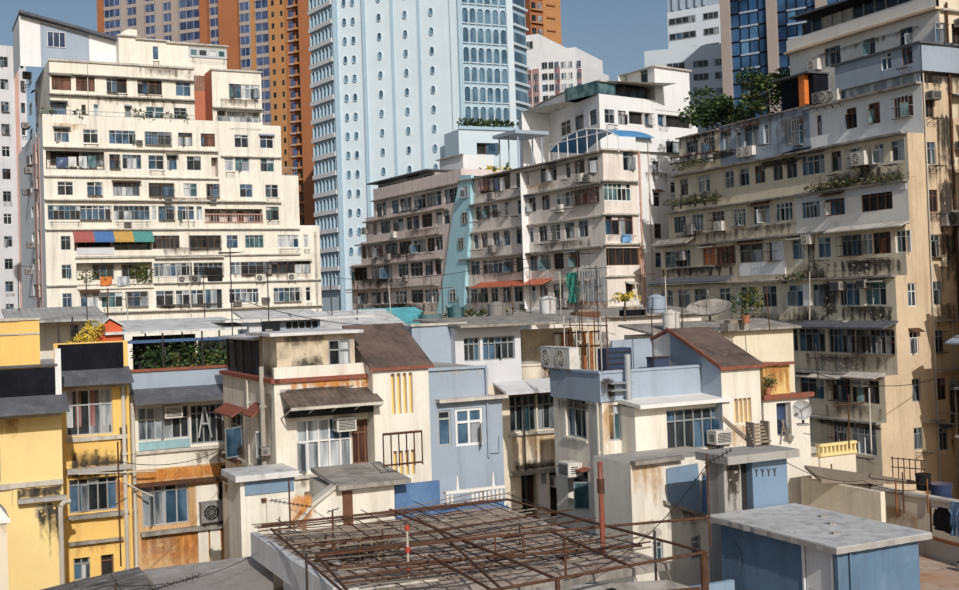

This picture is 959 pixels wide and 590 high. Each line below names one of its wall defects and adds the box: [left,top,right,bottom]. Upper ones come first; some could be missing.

leakage [926,72,959,89]
leakage [937,115,954,211]
leakage [940,226,957,281]
leakage [72,424,128,477]
rust [136,463,225,482]
leakage [17,485,61,538]
rust [290,494,312,529]
rust [142,528,224,556]